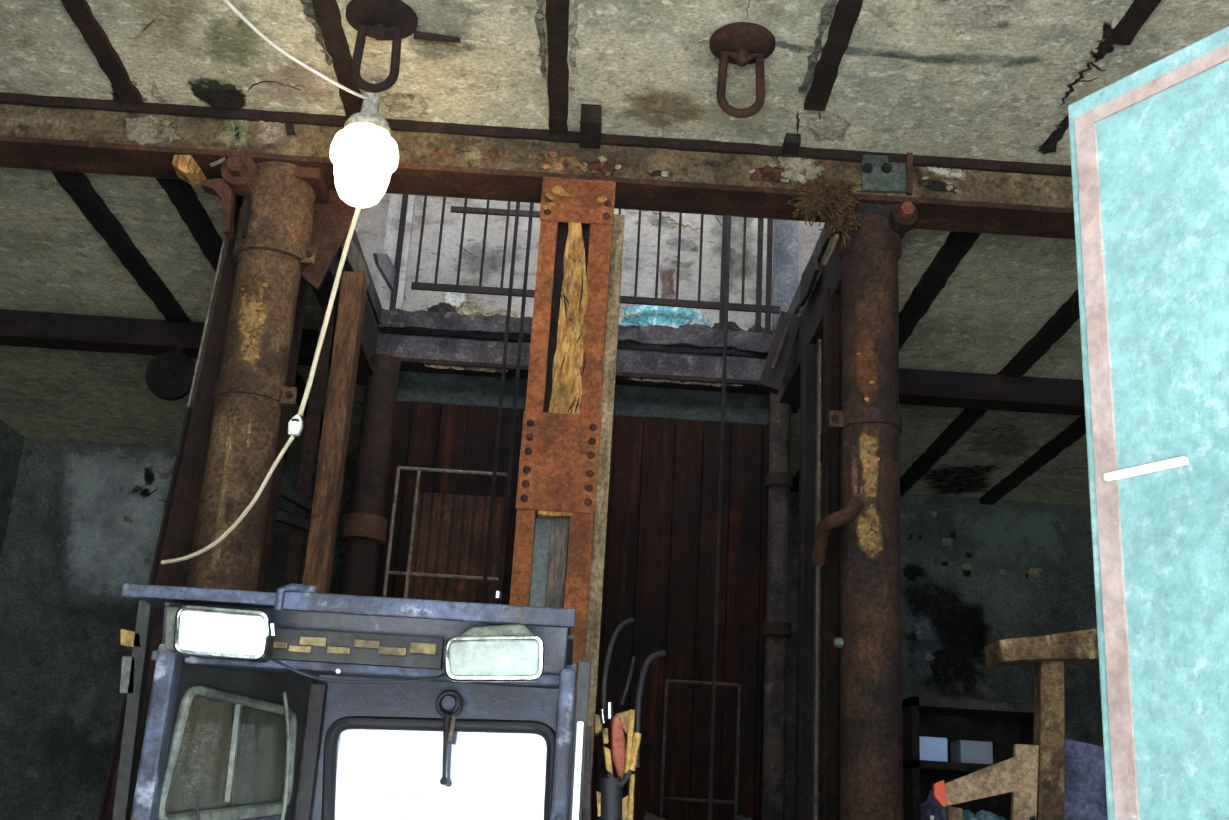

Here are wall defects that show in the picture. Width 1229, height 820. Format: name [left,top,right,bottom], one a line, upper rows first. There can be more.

spalling [299,0,332,66]
spalling [798,0,837,95]
crack [1060,57,1106,105]
corrosion [851,450,862,497]
water stain [902,564,990,699]